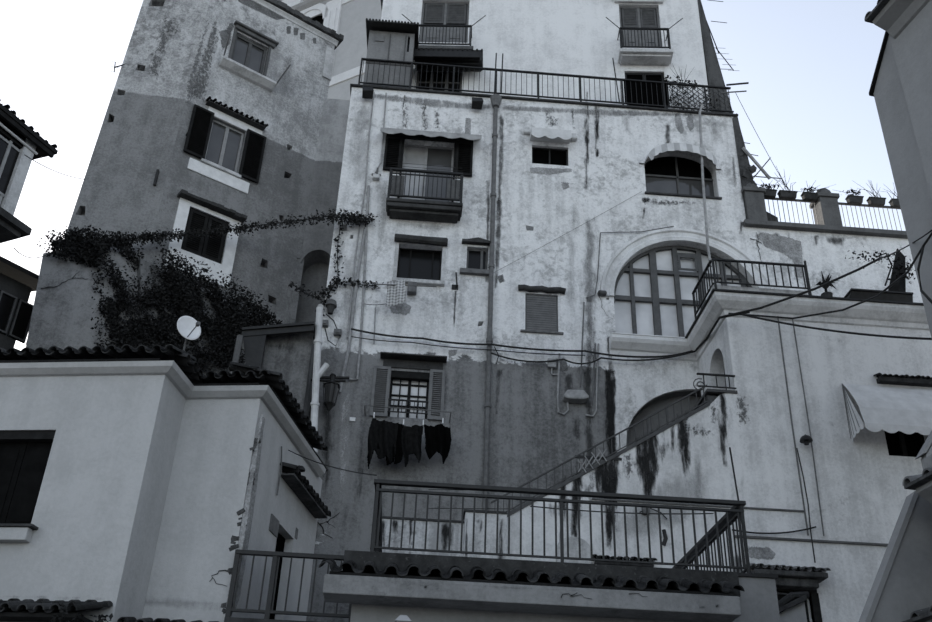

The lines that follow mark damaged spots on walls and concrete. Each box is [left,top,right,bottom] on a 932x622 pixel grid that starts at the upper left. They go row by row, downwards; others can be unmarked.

damp [554,223,619,545]
damp [634,413,690,495]
damp [719,393,727,464]